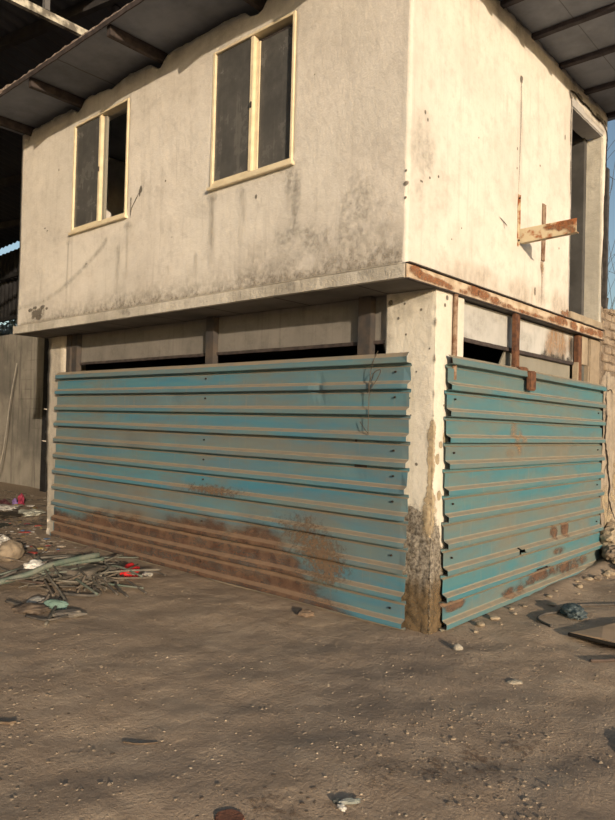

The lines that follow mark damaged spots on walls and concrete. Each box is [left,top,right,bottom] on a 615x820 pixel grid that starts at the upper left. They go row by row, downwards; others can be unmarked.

corrosion [544,220,576,233]
corrosion [410,265,603,361]
corrosion [51,509,349,614]
corrosion [503,522,585,599]
corrosion [439,599,464,612]